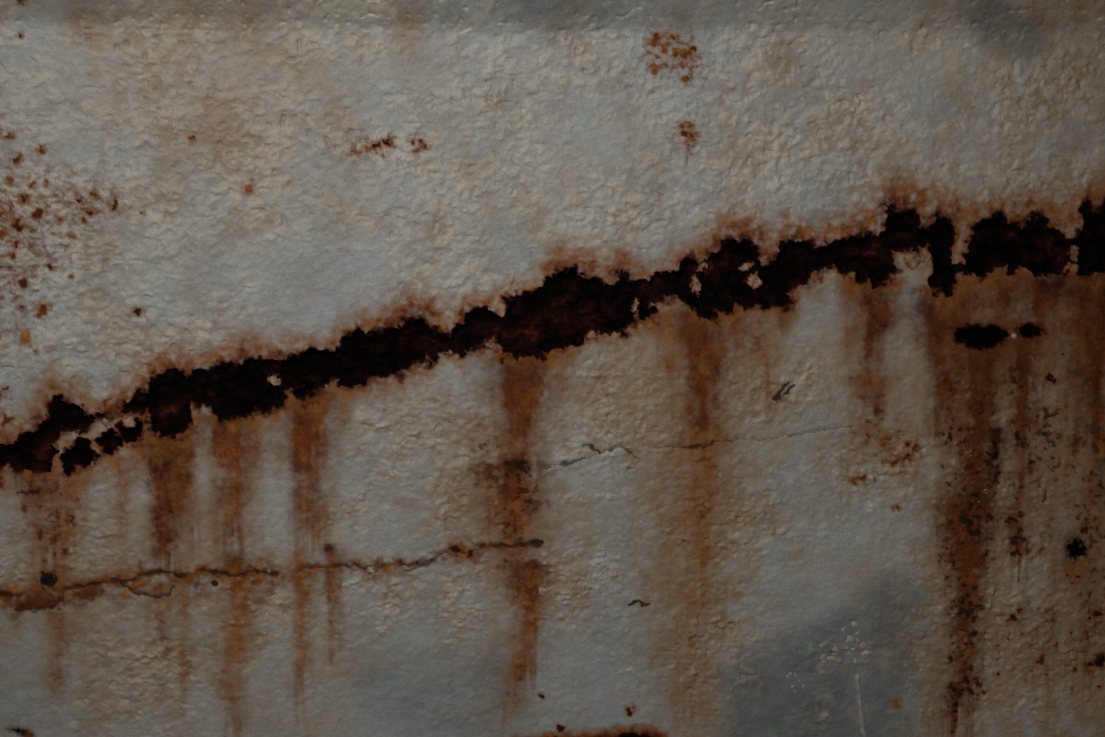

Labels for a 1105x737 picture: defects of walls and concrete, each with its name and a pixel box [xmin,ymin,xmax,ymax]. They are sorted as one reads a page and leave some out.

corrosion [649,32,698,82]
corrosion [0,178,49,288]
corrosion [36,302,52,318]
corrosion [11,466,87,563]
corrosion [140,414,259,667]
crack [0,539,544,619]
corrosion [286,388,347,538]
corrosion [475,350,559,696]
corrosion [660,303,741,536]
corrosion [843,279,919,466]
corrosion [916,271,1105,736]
corrosion [541,706,668,737]